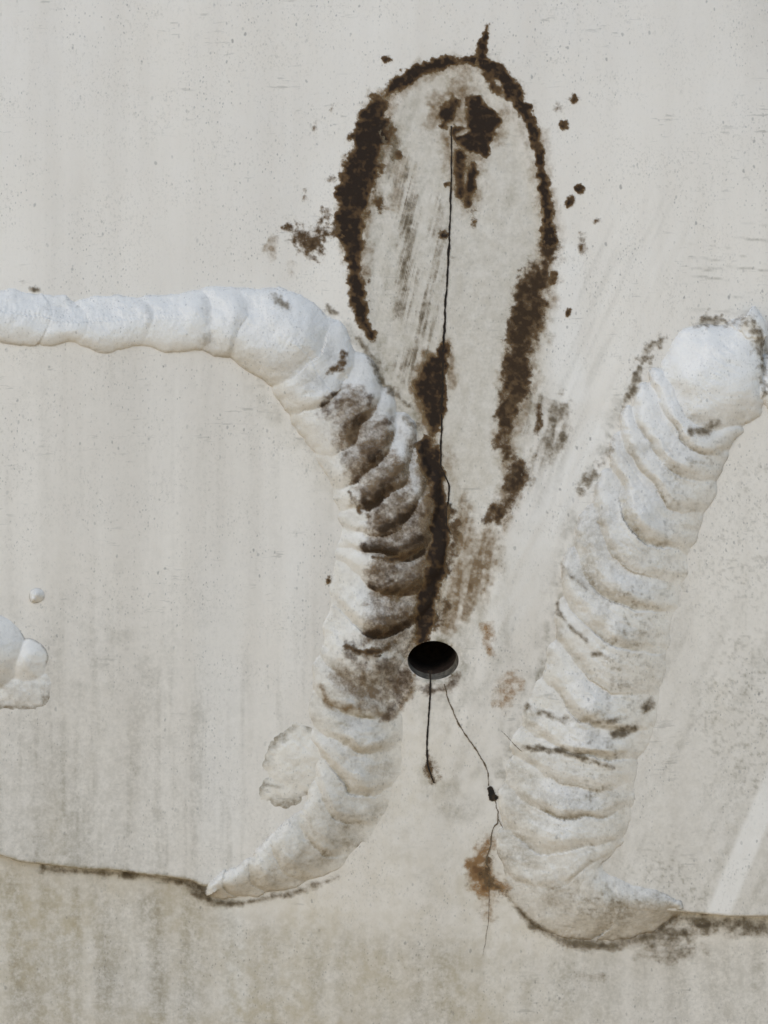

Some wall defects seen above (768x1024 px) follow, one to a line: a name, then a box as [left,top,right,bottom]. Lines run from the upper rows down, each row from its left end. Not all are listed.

corrosion [281,23,585,720]
crack [440,126,452,535]
crack [426,671,502,952]
corrosion [464,840,510,899]